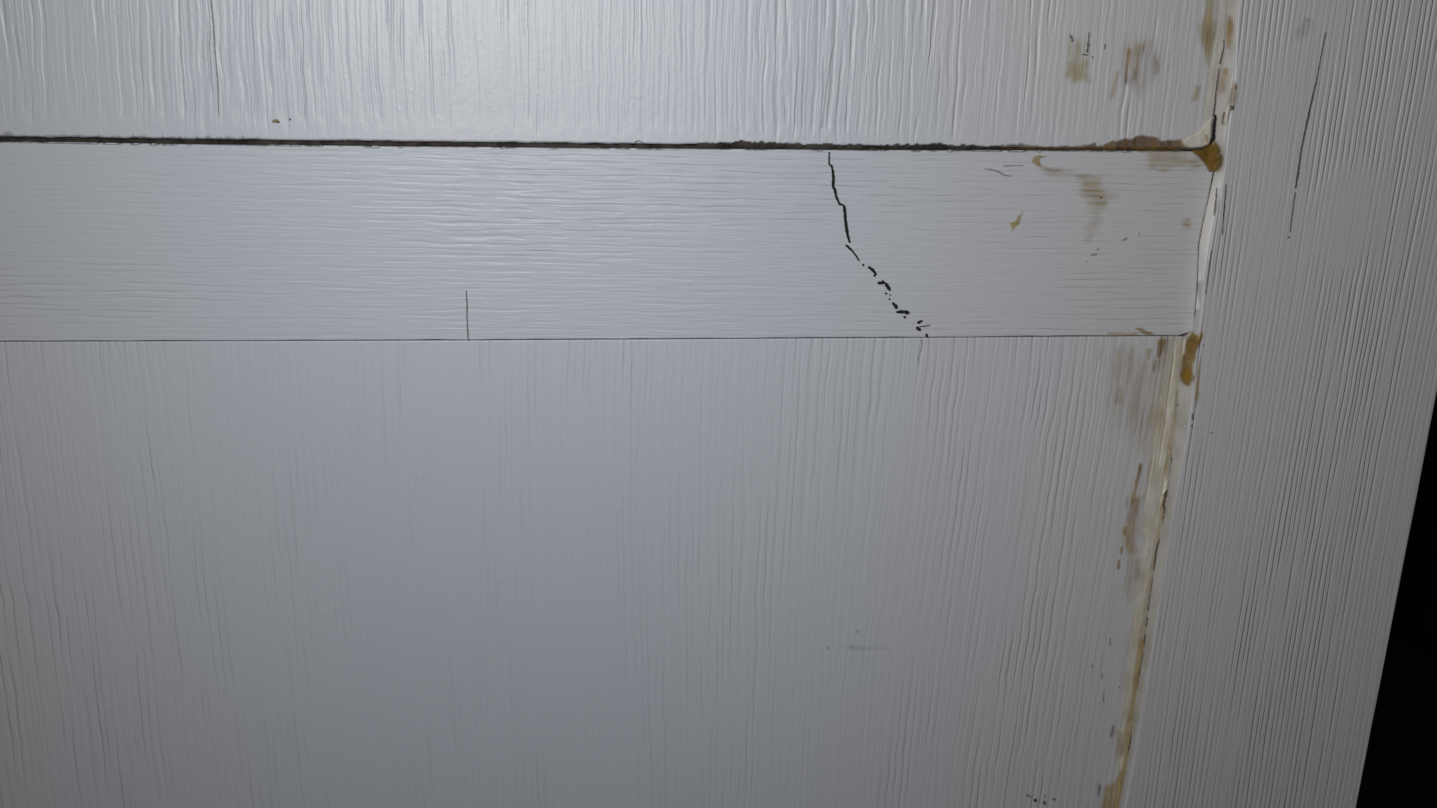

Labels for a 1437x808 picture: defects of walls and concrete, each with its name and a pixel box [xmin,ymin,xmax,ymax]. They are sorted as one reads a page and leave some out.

peeling [1183,106,1234,147]
crack [828,152,929,363]
peeling [1119,337,1186,773]